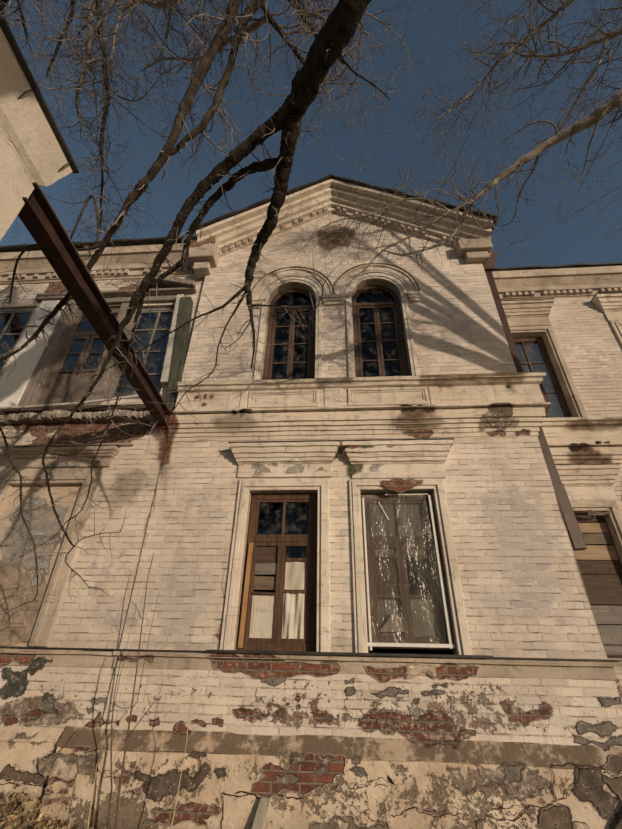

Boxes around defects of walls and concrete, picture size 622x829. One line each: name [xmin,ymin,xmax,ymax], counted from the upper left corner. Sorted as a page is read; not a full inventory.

corrosion [155,410,179,465]
flaking render [207,652,341,687]
flaking render [365,662,479,704]
peeling [0,692,137,746]
peeling [233,696,301,723]
peeling [360,707,476,749]
peeling [501,700,553,726]
flaking render [131,751,227,829]
crack [221,791,304,829]
crack [390,763,622,829]
flaking render [538,803,588,829]
flaking render [572,720,622,820]